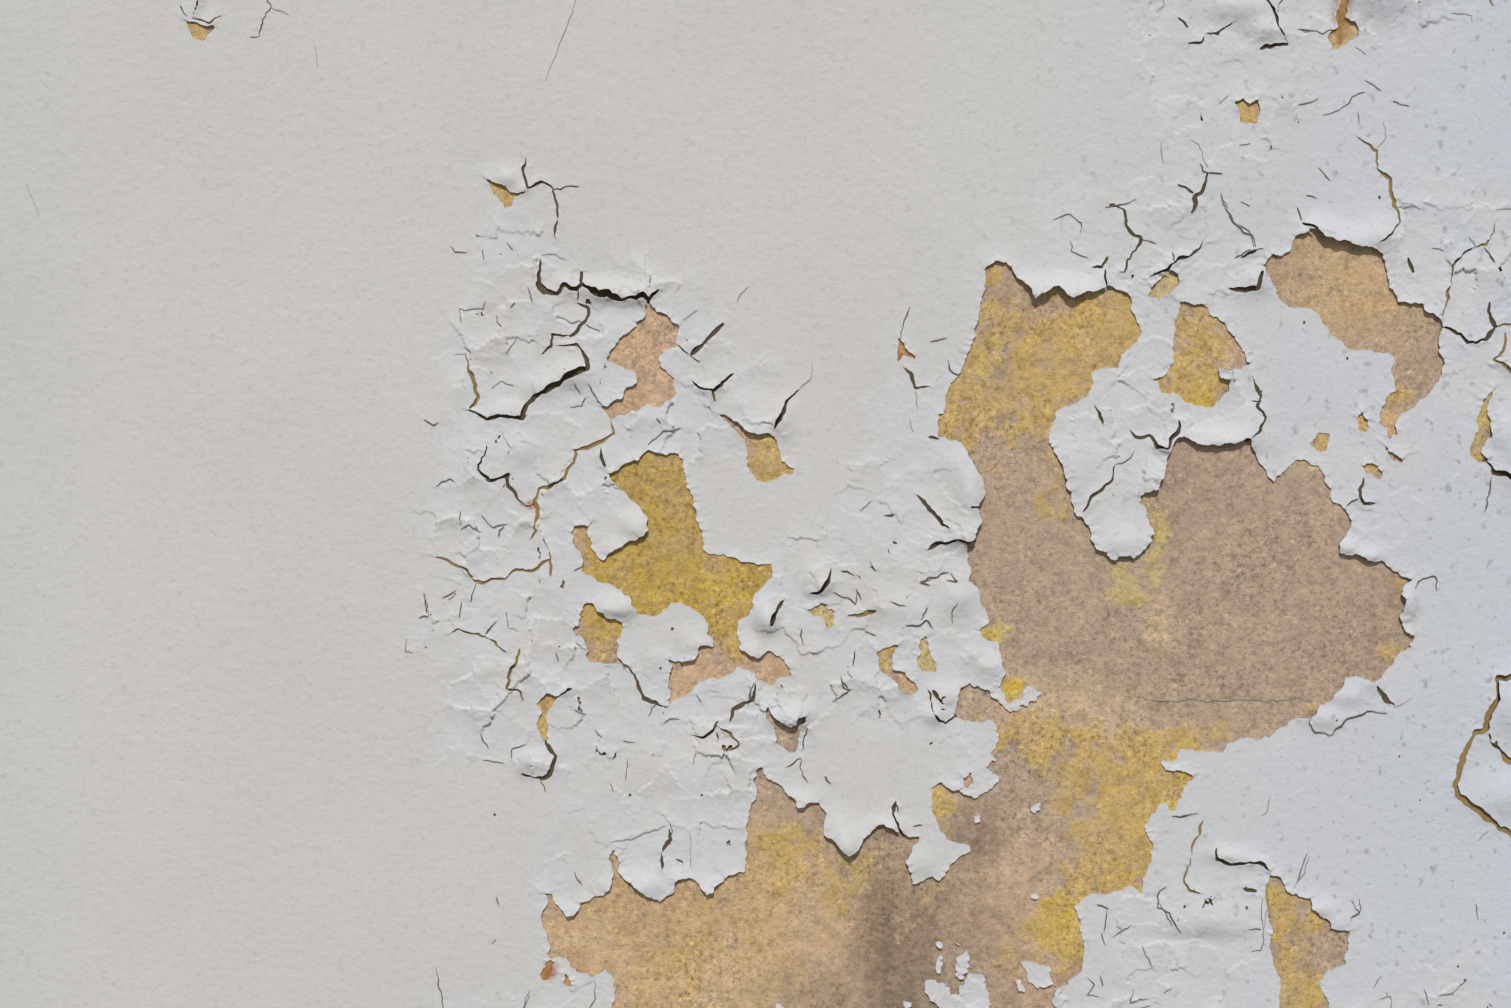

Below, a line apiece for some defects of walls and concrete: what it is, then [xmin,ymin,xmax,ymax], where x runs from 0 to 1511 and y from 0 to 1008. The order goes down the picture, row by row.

crack [180,0,221,24]
crack [251,0,288,38]
peeling [486,163,528,208]
peeling [1255,174,1445,479]
peeling [1470,392,1492,463]
crack [1482,458,1511,513]
peeling [540,257,1414,1008]
peeling [513,693,559,777]
crack [1452,674,1511,841]
crack [1373,976,1492,1007]